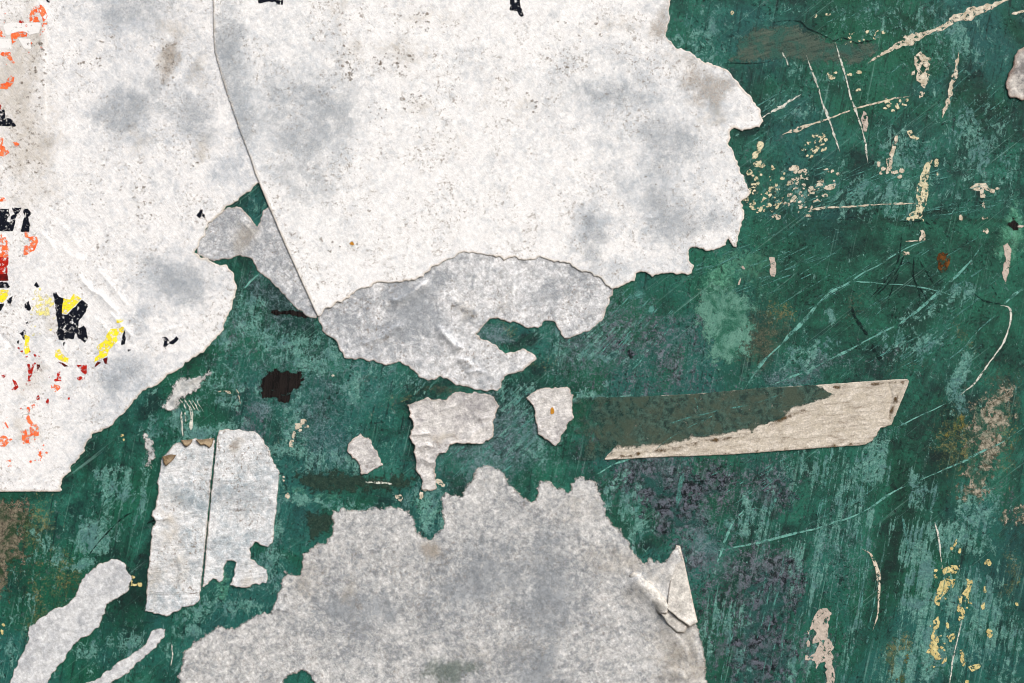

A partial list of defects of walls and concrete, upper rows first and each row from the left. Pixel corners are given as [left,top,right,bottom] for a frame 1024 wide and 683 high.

peeling [723,13,885,80]
peeling [883,51,930,112]
peeling [743,133,839,220]
peeling [877,130,919,179]
peeling [907,159,939,240]
peeling [970,183,999,234]
rust [937,252,951,272]
peeling [289,419,309,447]
peeling [612,459,737,548]
peeling [724,554,835,683]
peeling [926,539,987,683]